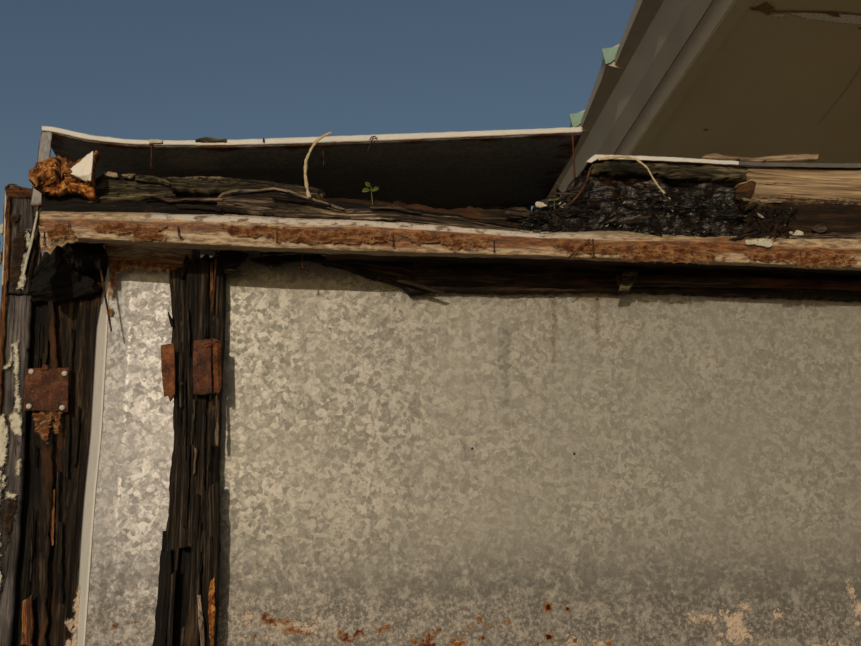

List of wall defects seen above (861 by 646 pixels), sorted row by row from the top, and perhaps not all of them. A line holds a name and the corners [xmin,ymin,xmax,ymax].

crack [751,2,861,30]
corrosion [94,220,167,243]
corrosion [220,222,493,252]
corrosion [553,241,727,264]
corrosion [745,250,859,269]
corrosion [107,260,180,315]
corrosion [32,411,61,444]
corrosion [405,626,442,646]
corrosion [448,615,494,646]
corrosion [557,631,612,646]